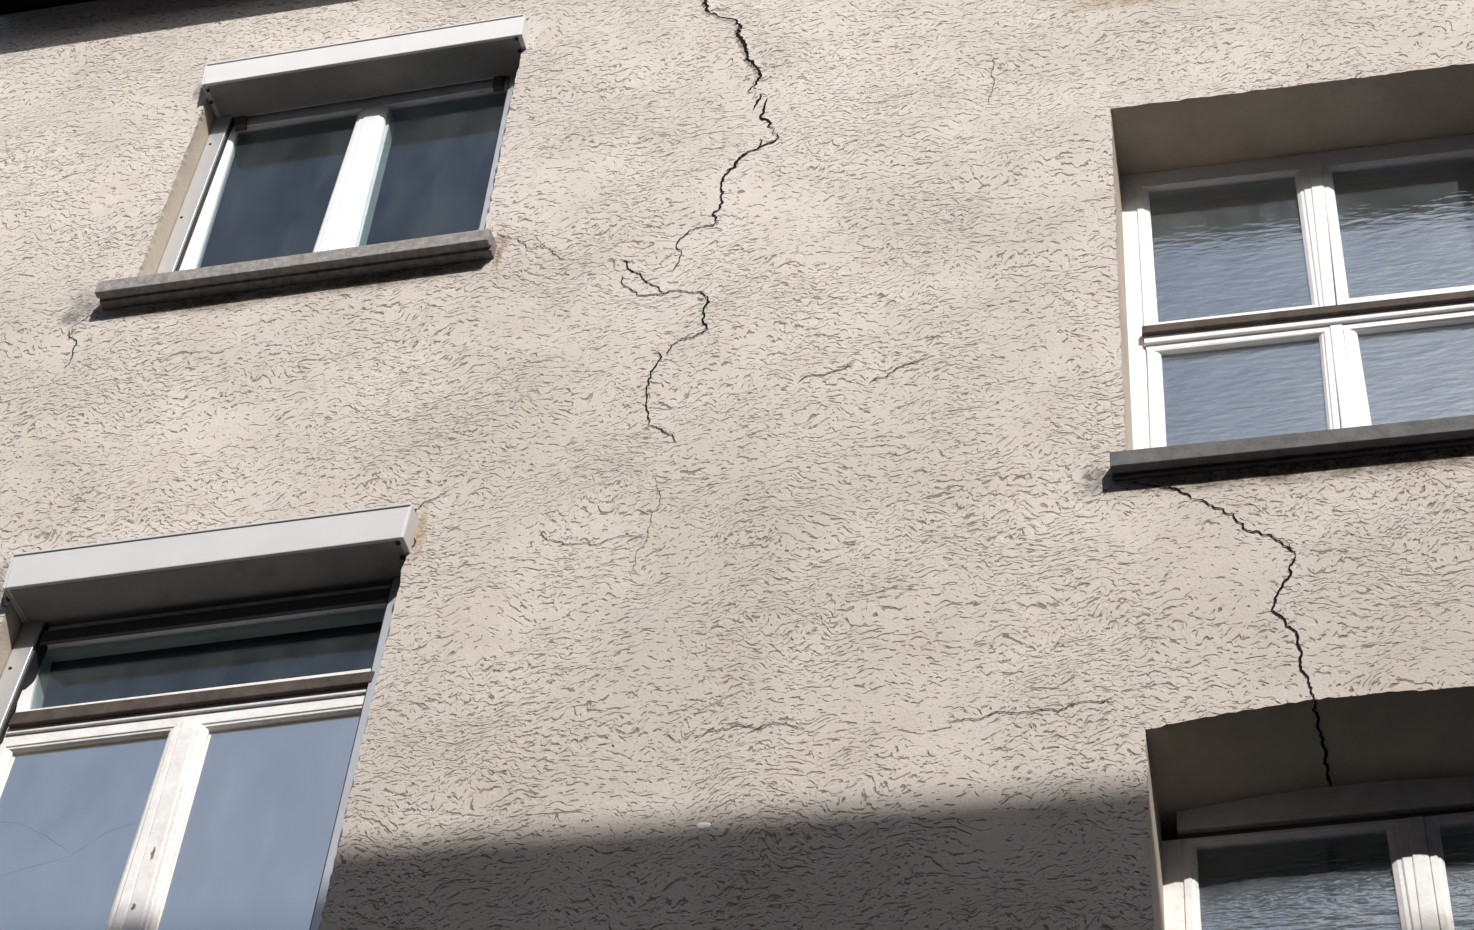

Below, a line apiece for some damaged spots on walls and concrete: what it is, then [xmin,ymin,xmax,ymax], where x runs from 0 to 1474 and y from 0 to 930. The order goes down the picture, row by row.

crack [619,0,780,442]
crack [632,477,709,576]
crack [1136,482,1332,787]